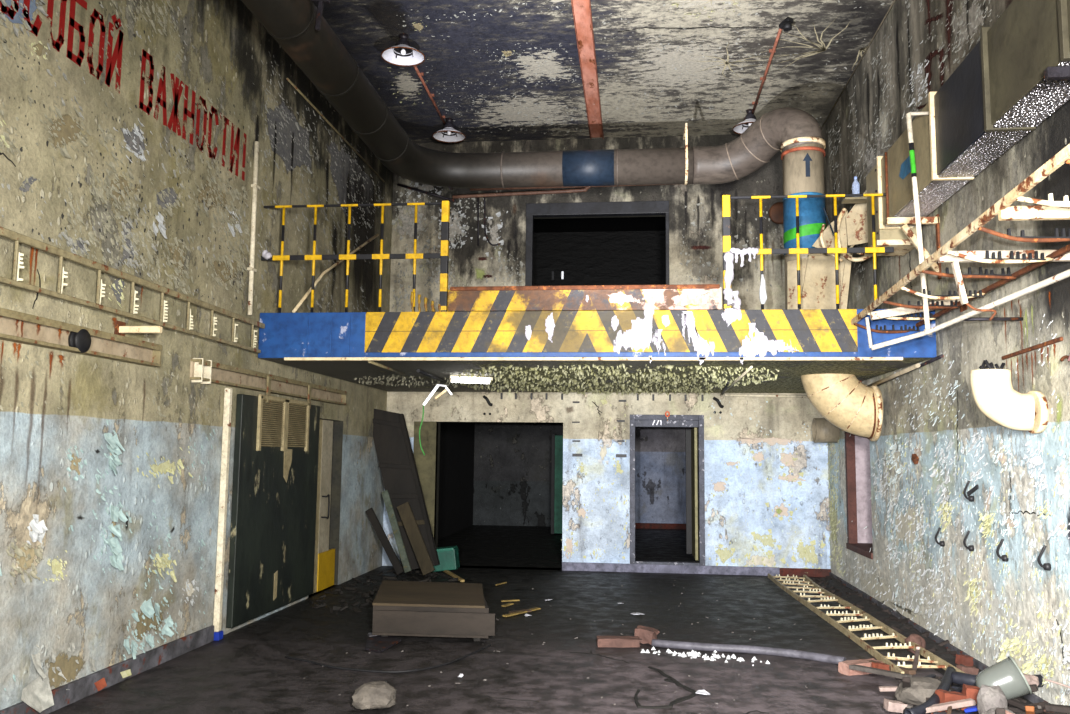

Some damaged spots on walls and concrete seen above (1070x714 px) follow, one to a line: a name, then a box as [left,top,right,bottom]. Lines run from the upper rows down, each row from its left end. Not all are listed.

leakage [367,1,413,41]
leakage [690,21,851,78]
rust [1002,337,1063,390]
peeling [137,340,216,488]
peeling [0,514,67,588]
peeling [120,500,208,678]
peeling [708,343,1070,705]
peeling [4,634,107,713]